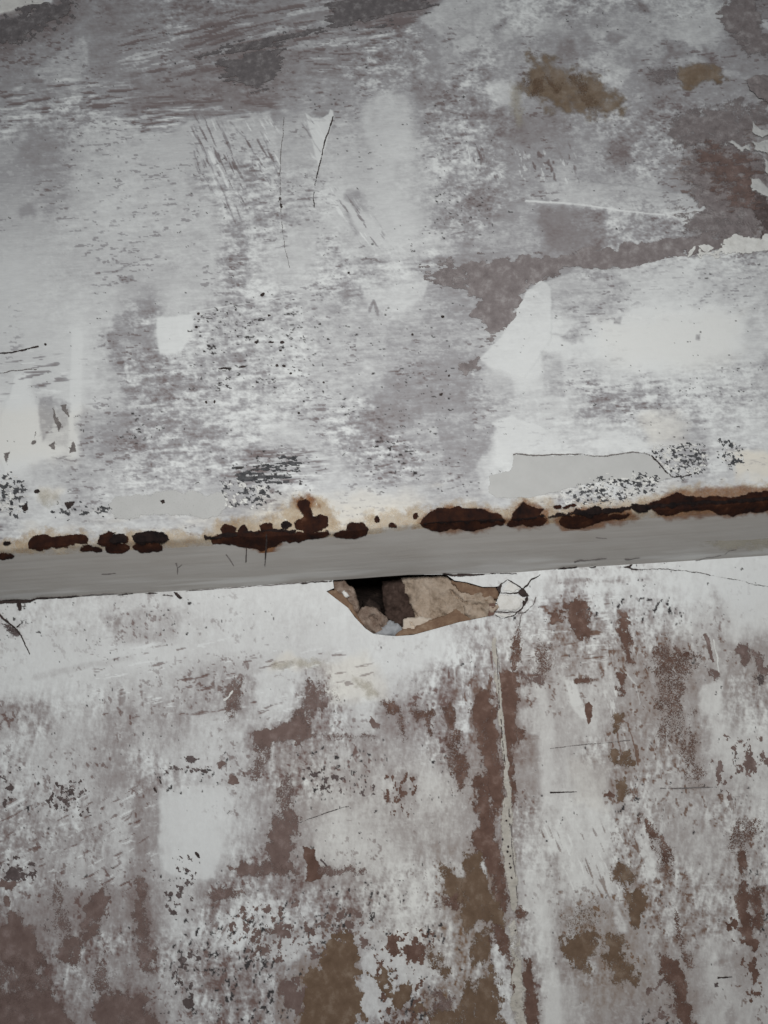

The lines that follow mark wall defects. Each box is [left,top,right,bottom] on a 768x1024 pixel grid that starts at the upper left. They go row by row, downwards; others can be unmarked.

water stain [520,52,625,121]
peeling [489,438,745,509]
corrosion [0,485,768,560]
spalling [327,574,500,636]
crack [442,537,762,633]